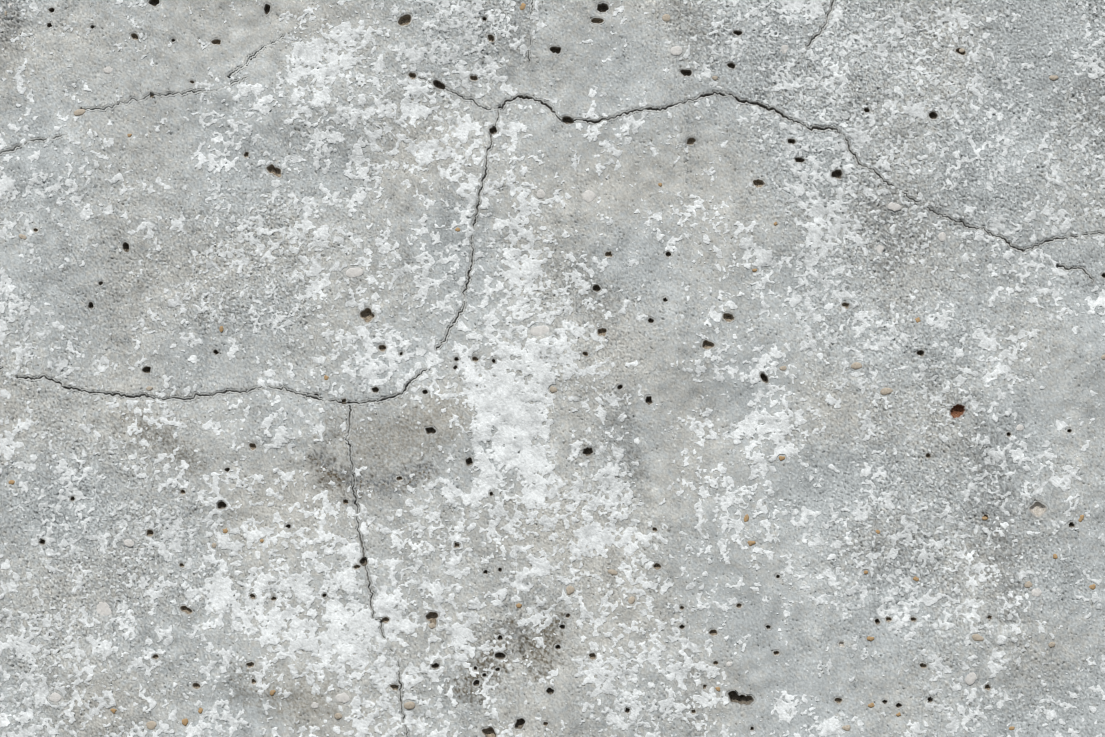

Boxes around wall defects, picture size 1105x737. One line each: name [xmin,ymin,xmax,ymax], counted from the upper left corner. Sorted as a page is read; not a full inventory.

crack [82,24,306,112]
crack [417,75,432,85]
crack [796,0,835,68]
crack [0,133,69,156]
crack [574,78,1105,253]
crack [1058,264,1096,285]
crack [18,87,562,737]